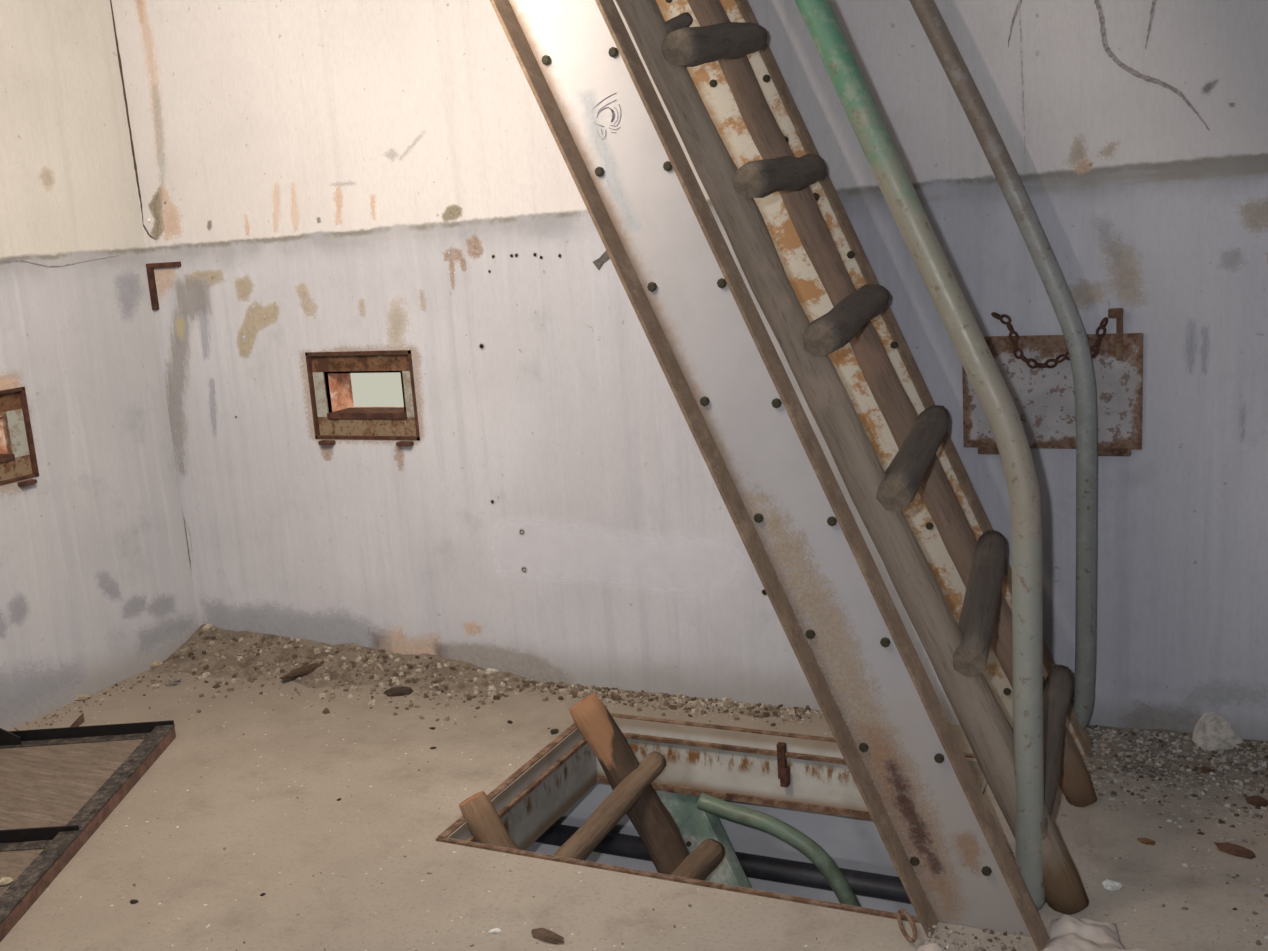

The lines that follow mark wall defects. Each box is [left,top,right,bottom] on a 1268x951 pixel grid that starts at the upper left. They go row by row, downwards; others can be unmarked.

crack [110,0,159,240]
crack [1008,0,1026,164]
crack [1094,0,1209,130]
rust [0,375,21,391]
peeling [186,270,279,357]
rust [302,300,423,470]
rust [746,486,978,920]